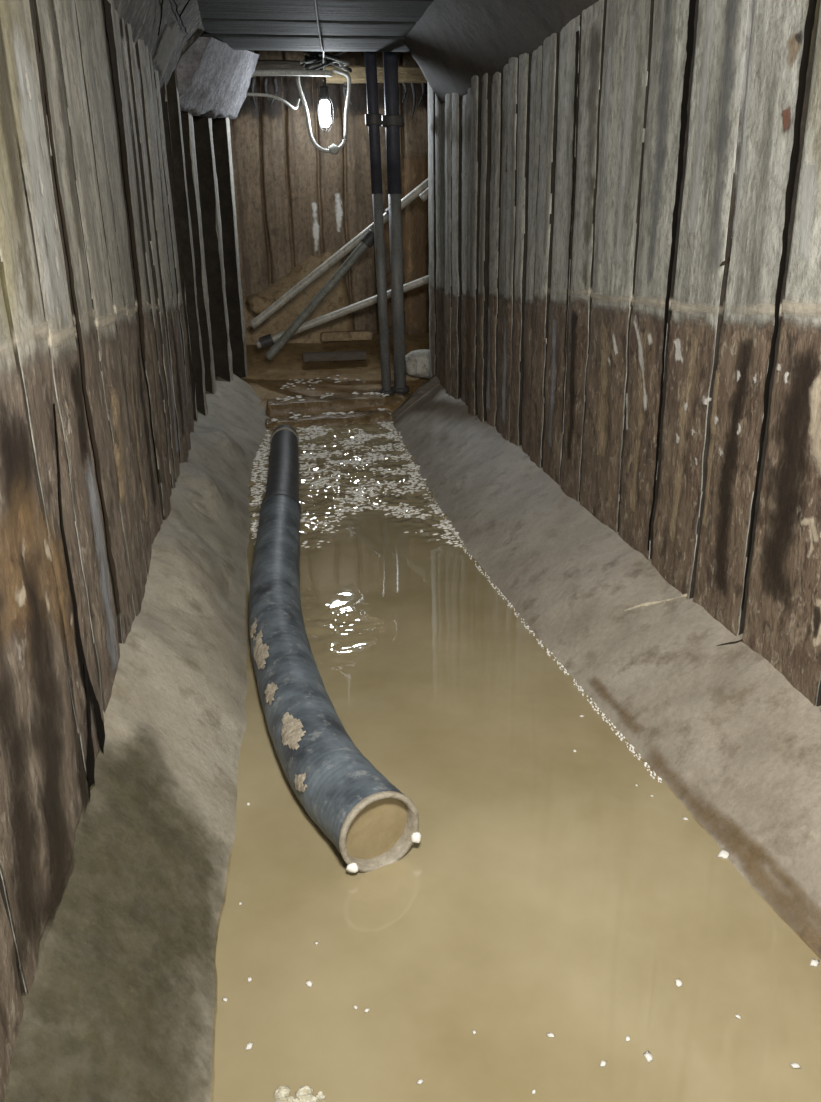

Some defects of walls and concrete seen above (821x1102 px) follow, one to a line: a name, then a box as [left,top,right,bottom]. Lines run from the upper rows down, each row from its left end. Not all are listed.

crack [34,0,121,614]
crack [53,404,105,800]
damp [0,302,218,1102]
damp [527,50,550,263]
damp [585,30,612,261]
damp [430,112,821,706]
damp [649,0,669,280]
damp [688,0,755,233]